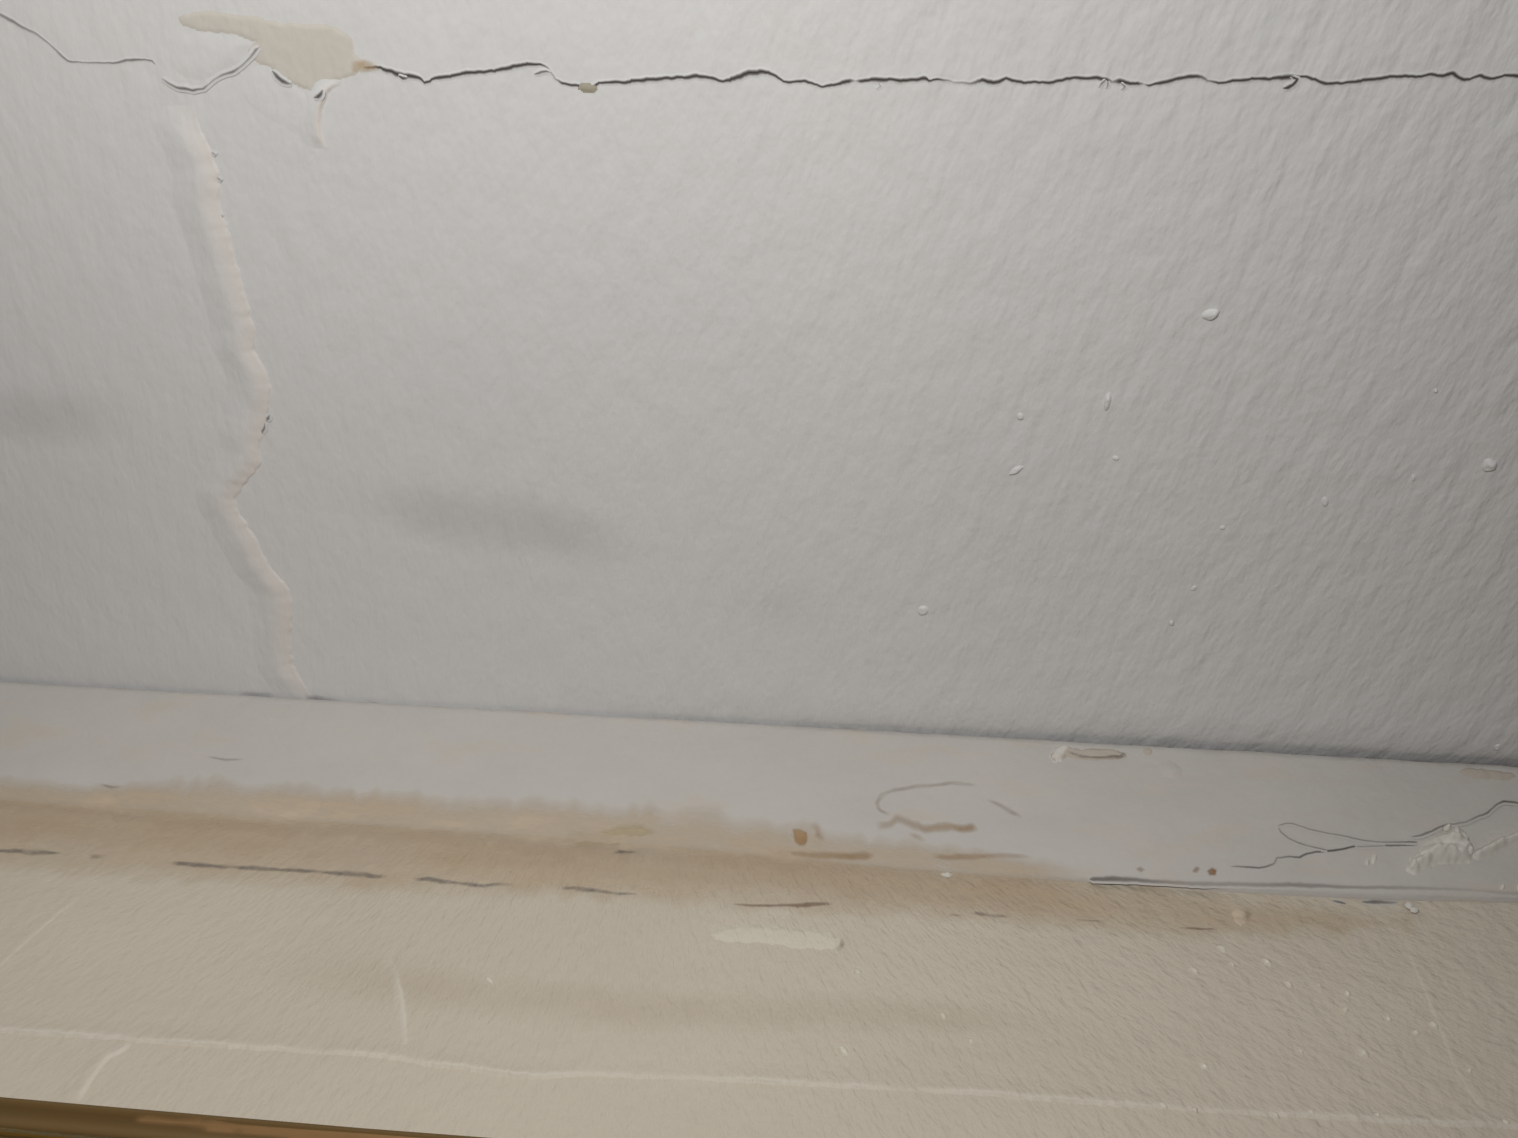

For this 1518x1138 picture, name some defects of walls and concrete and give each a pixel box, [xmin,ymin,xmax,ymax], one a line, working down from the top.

crack [0,11,262,94]
peeling [169,11,368,149]
crack [365,60,1518,93]
damp [0,789,850,863]
crack [1089,798,1518,906]